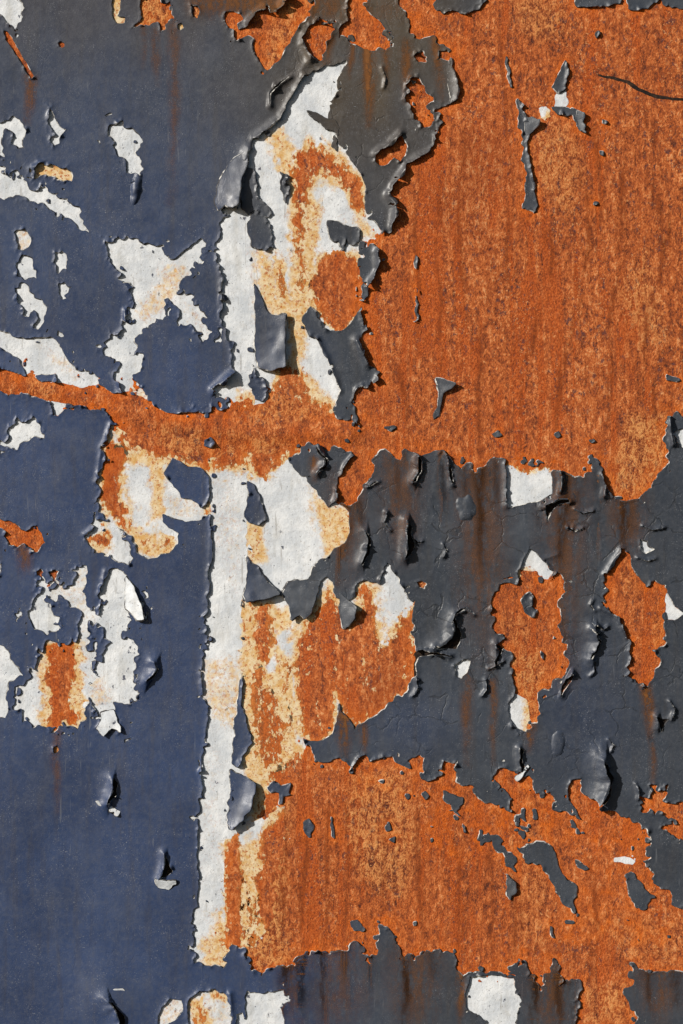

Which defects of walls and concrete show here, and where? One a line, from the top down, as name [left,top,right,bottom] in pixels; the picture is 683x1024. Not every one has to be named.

peeling [0,116,88,232]
peeling [0,229,99,388]
peeling [97,61,381,414]
corrosion [0,0,683,512]
crack [598,74,683,101]
peeling [0,417,44,454]
peeling [505,459,569,518]
peeling [0,425,470,967]
peeling [508,688,536,732]
corrosion [491,566,573,740]
corrosion [602,549,678,725]
corrosion [245,728,683,1024]